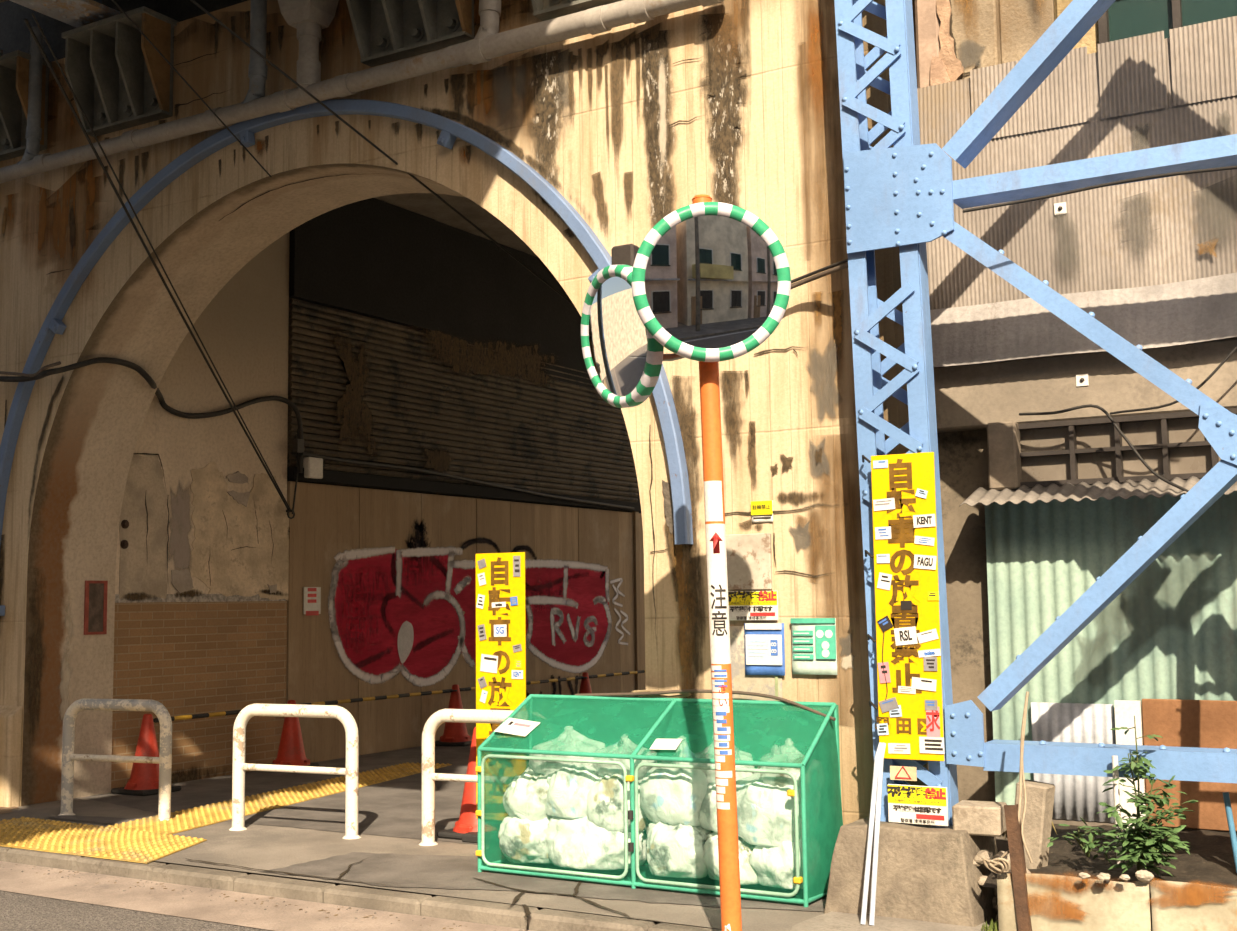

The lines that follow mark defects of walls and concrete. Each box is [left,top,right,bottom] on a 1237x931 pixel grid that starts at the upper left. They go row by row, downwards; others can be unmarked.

leakage [416,23,675,229]
leakage [701,0,749,206]
corrosion [7,159,99,270]
leakage [535,192,575,237]
peeling [119,454,289,601]
corrosion [1026,875,1104,921]
corrosion [1149,878,1235,907]